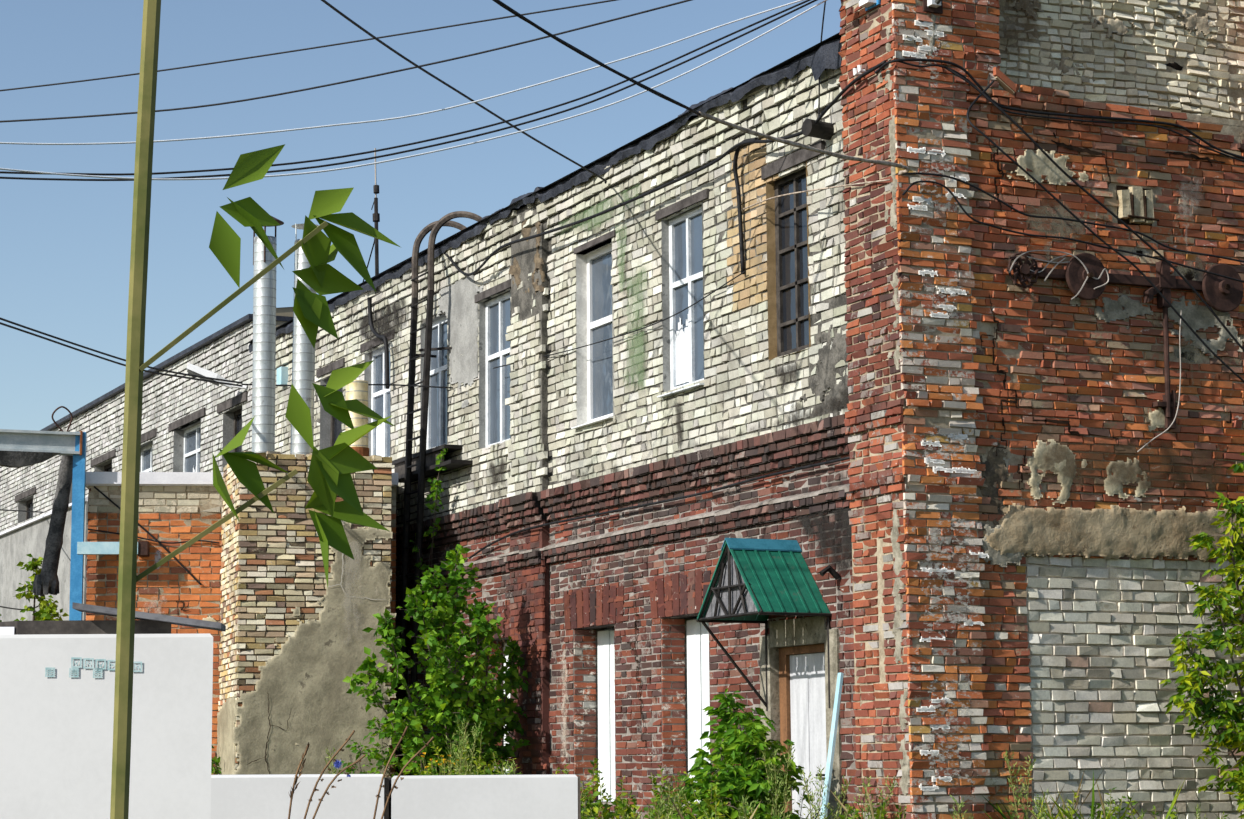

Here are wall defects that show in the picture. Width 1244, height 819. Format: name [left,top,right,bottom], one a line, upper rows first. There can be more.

spalling [1177,9,1221,40]
spalling [1048,57,1090,83]
crack [989,141,1007,211]
damp [918,270,967,319]
damp [921,425,977,474]
spalling [977,435,1014,525]
damp [920,518,989,642]
damp [916,677,974,791]